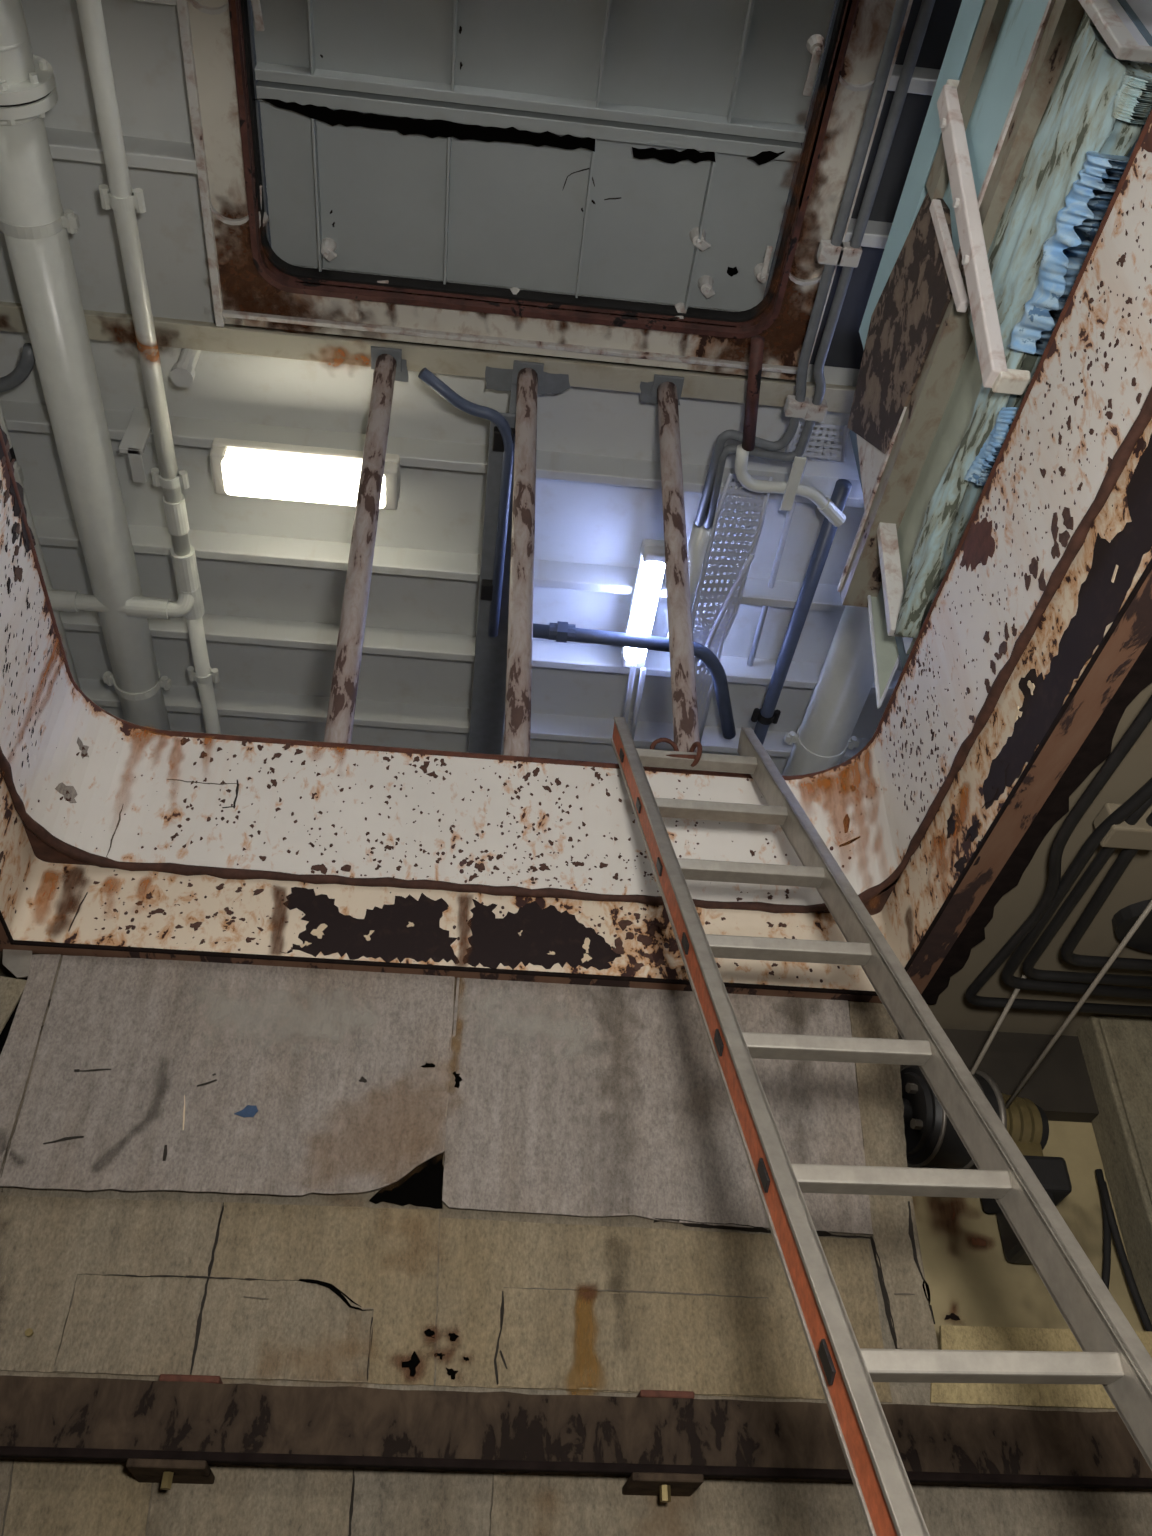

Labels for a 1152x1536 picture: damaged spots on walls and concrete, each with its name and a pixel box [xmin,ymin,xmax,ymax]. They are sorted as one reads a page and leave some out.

corrosion [214,203,371,367]
peeling [885,125,1152,873]
peeling [93,737,666,974]
corrosion [932,785,969,891]
hole [402,1329,469,1380]
corrosion [569,1287,600,1395]